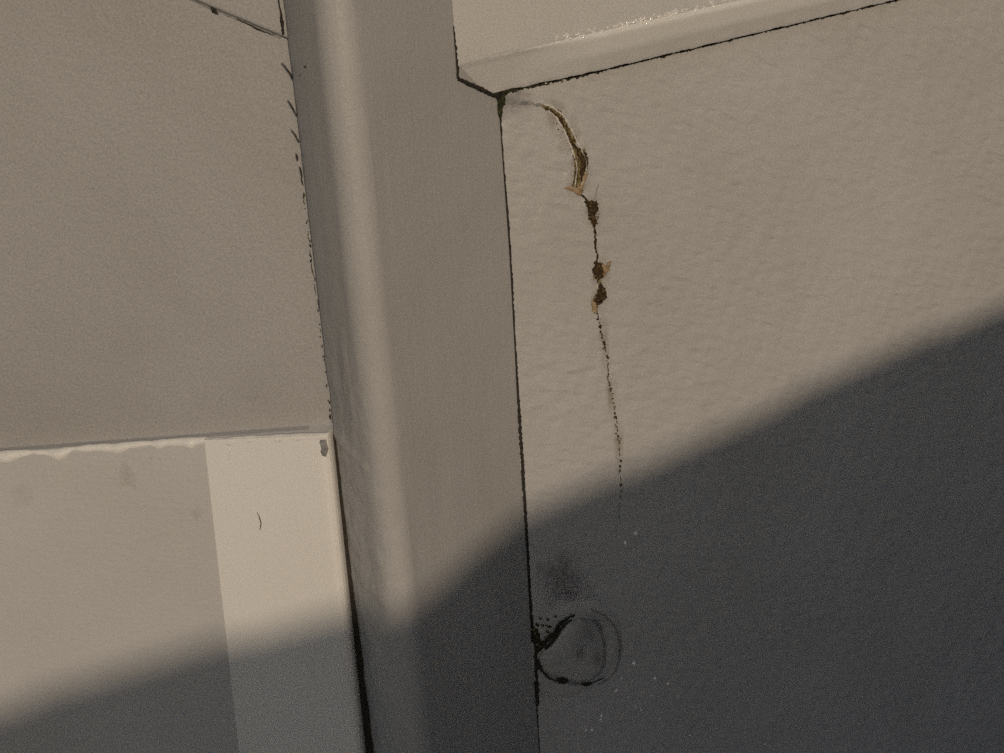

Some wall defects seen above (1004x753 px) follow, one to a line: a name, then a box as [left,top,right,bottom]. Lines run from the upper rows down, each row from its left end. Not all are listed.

crack [499,0,898,753]